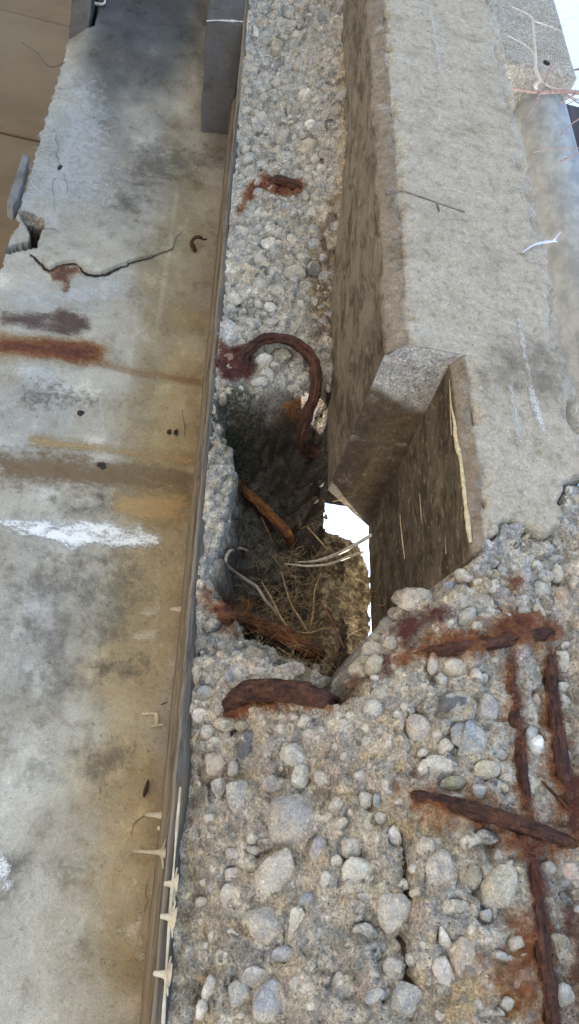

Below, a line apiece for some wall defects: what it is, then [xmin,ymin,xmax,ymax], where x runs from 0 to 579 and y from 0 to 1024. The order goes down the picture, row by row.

rust [236,172,307,215]
spalling [18,210,44,250]
crack [30,232,182,277]
rust [51,265,79,292]
rust [0,310,108,366]
rust [213,338,258,380]
spalling [167,0,579,1024]
rust [201,582,256,638]
rust [225,690,352,730]
rust [381,576,579,1024]